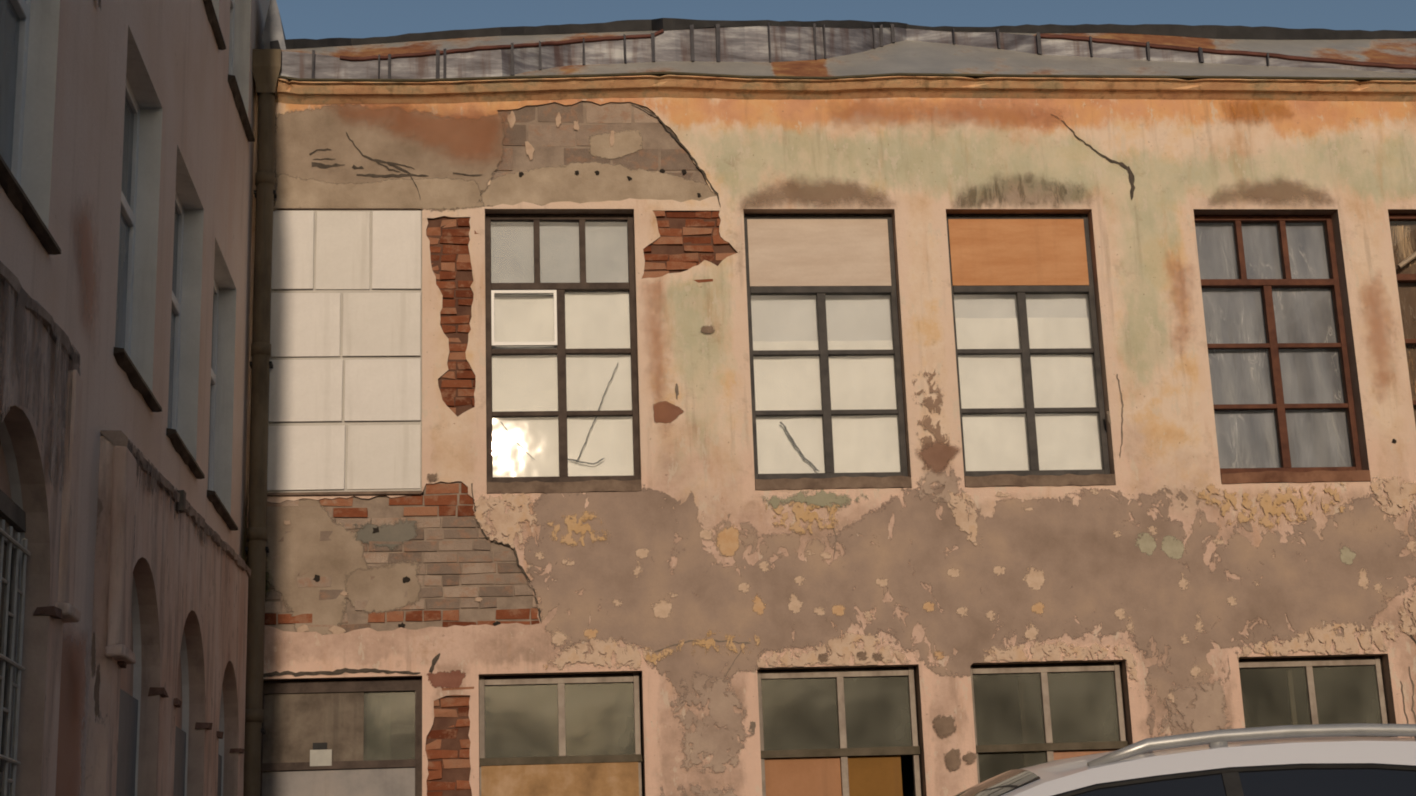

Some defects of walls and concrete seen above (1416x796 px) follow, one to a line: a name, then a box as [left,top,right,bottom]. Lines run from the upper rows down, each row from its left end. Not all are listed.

rust [1040,34,1416,70]
crack [309,132,481,200]
damp [743,181,884,209]
damp [957,177,1079,207]
crack [1051,114,1135,200]
damp [1213,180,1331,203]
peeling [273,102,736,424]
peeling [265,370,1416,796]